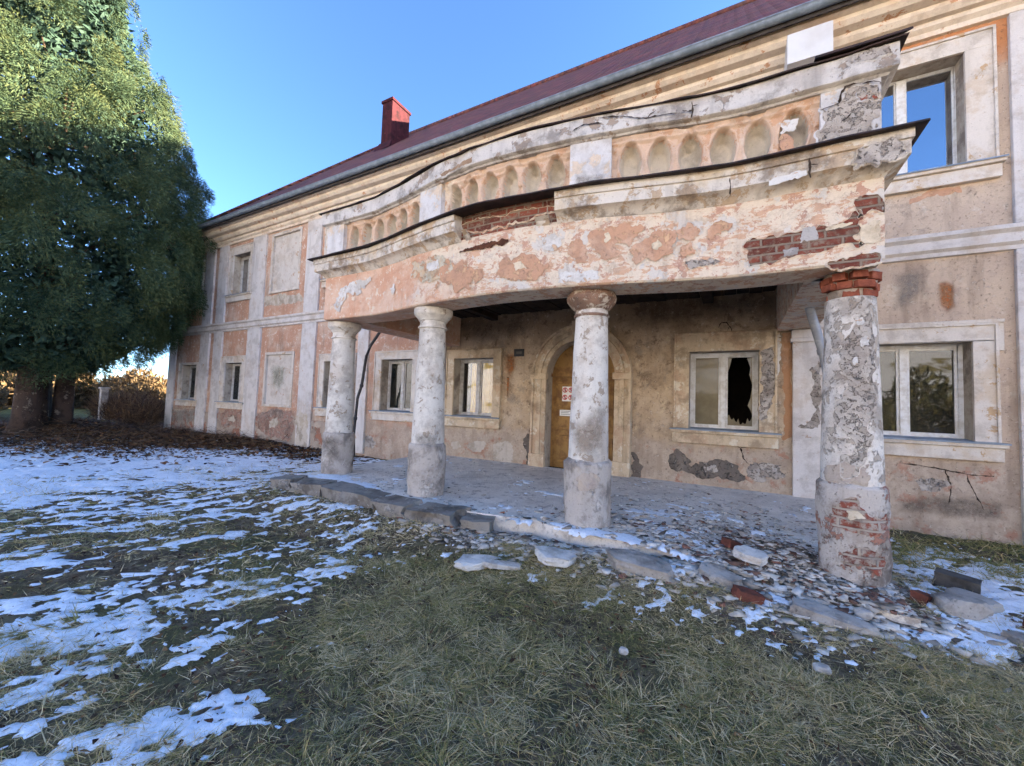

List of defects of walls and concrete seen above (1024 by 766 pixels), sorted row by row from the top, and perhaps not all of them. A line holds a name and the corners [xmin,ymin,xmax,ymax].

crack [574,103,696,130]
spalling [813,80,911,171]
peeling [334,277,371,312]
peeling [411,254,483,293]
flaking render [462,205,555,234]
peeling [496,220,733,281]
flaking render [742,193,885,272]
peeling [757,304,879,485]
spalling [668,448,786,483]
crack [902,463,994,511]
flaking render [831,497,887,576]